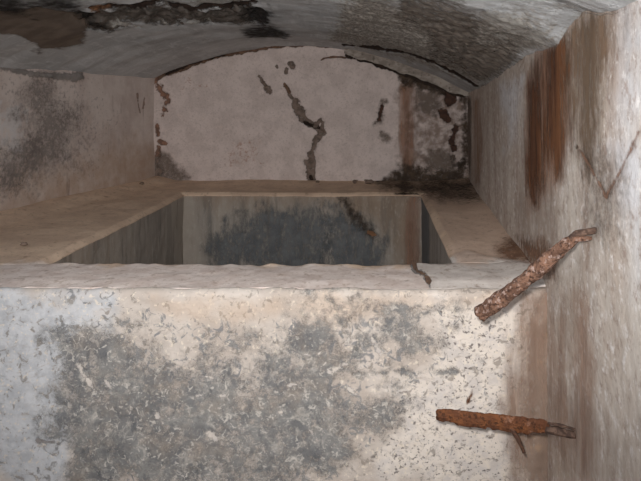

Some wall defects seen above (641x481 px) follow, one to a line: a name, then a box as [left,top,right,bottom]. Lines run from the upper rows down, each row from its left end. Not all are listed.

spalling [81,0,261,32]
water stain [0,73,78,190]
crack [283,83,327,180]
crack [158,44,479,97]
water stain [398,74,446,117]
water stain [377,96,480,202]
rust [525,36,572,206]
water stain [205,202,388,266]
rust [436,227,597,481]